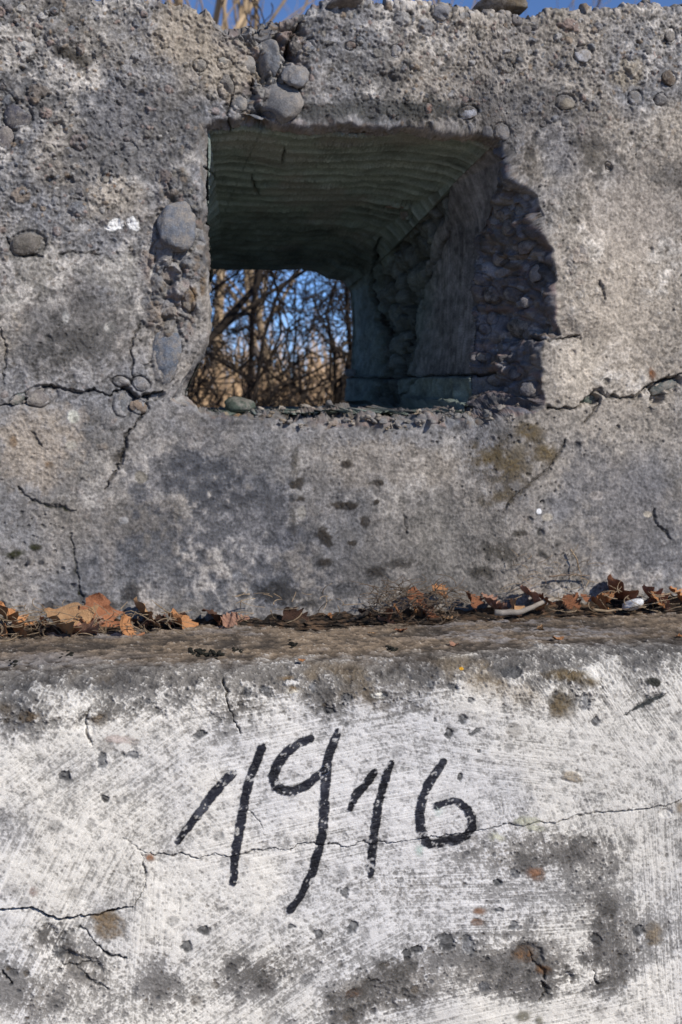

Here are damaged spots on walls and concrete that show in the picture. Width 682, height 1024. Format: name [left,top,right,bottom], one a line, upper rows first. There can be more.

crack [6,849,260,959]
crack [535,963,547,999]